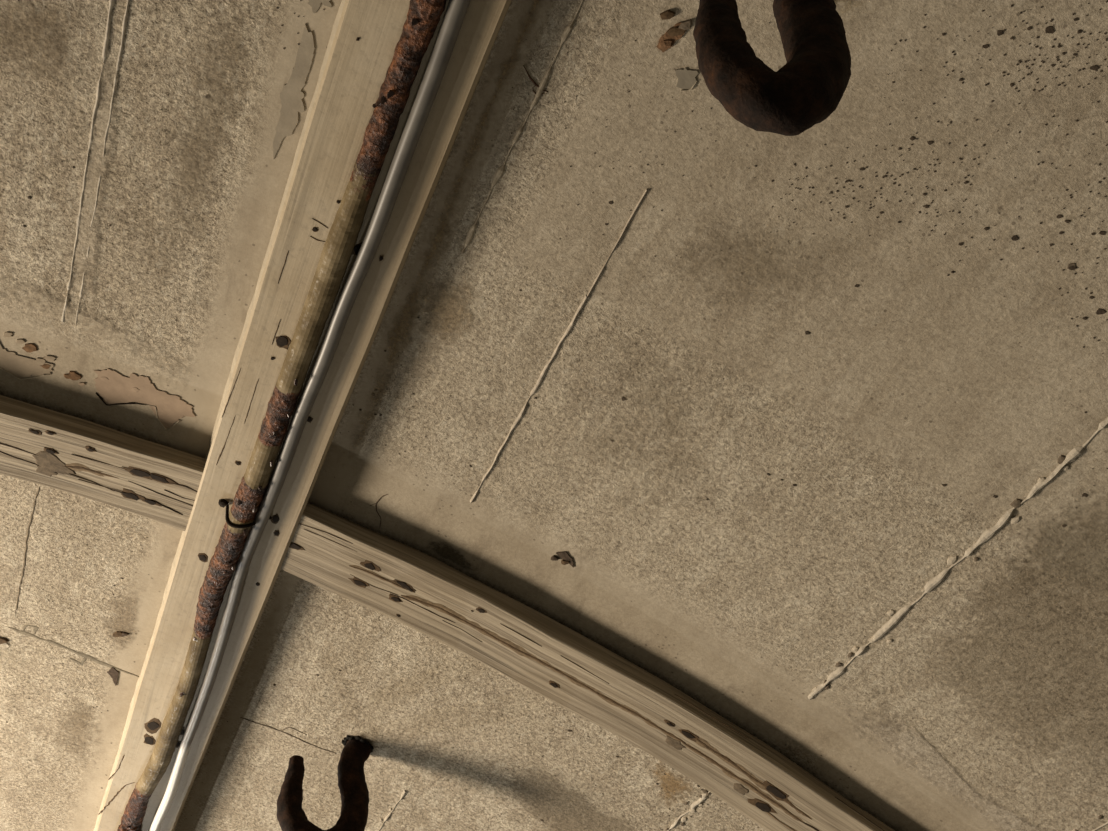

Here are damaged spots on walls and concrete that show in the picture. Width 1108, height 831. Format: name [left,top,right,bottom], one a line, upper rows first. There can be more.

spalling [656,9,692,52]
rust [372,90,395,108]
peeling [0,331,196,431]